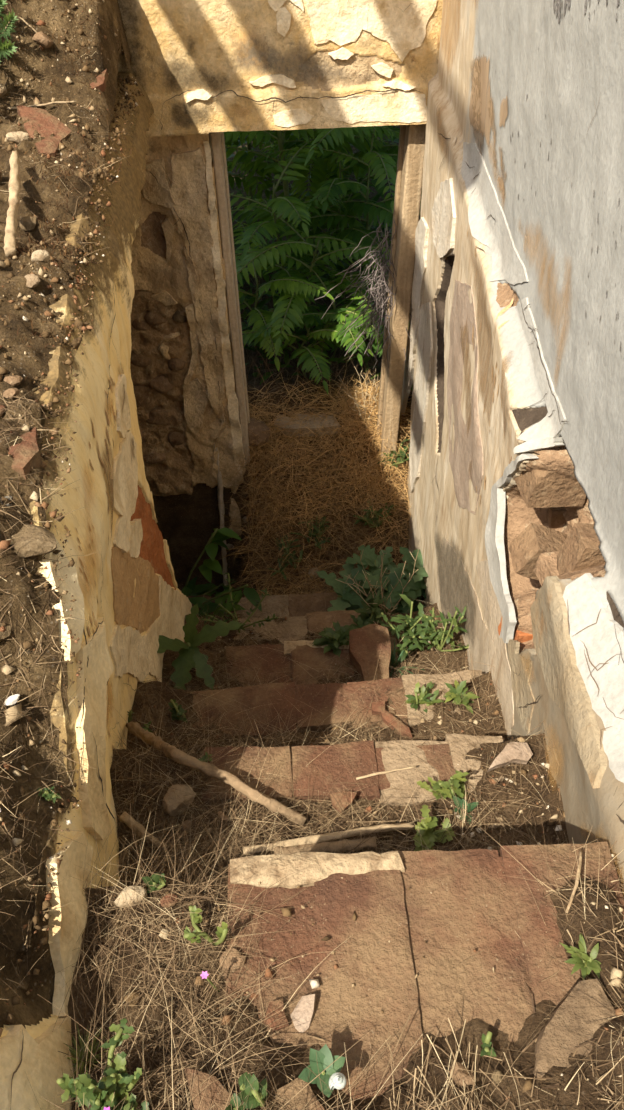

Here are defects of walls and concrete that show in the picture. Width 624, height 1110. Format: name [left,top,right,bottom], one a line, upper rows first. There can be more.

leakage [167,59,227,127]
peeling [186,88,212,103]
leakage [237,40,342,79]
crack [159,88,428,130]
peeling [249,0,437,127]
spalling [401,56,624,783]
spalling [0,140,245,1110]
crack [567,599,624,750]